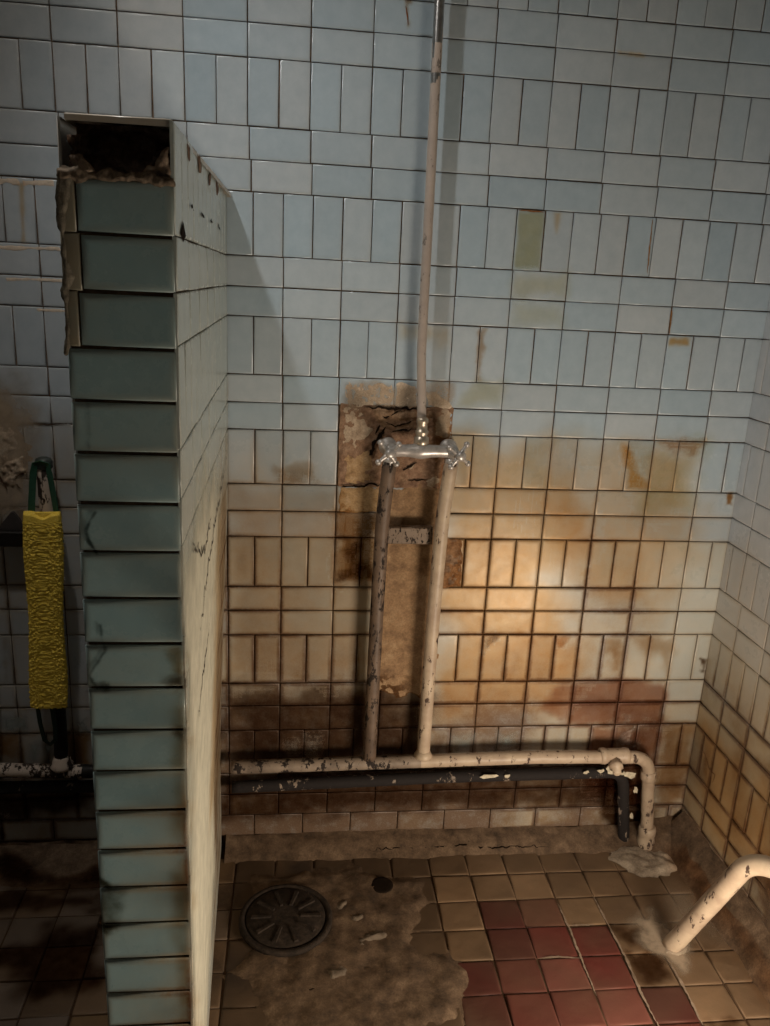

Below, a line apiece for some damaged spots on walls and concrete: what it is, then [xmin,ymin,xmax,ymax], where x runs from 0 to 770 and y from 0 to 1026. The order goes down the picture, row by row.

spalling [0,123,176,356]
spalling [338,382,454,488]